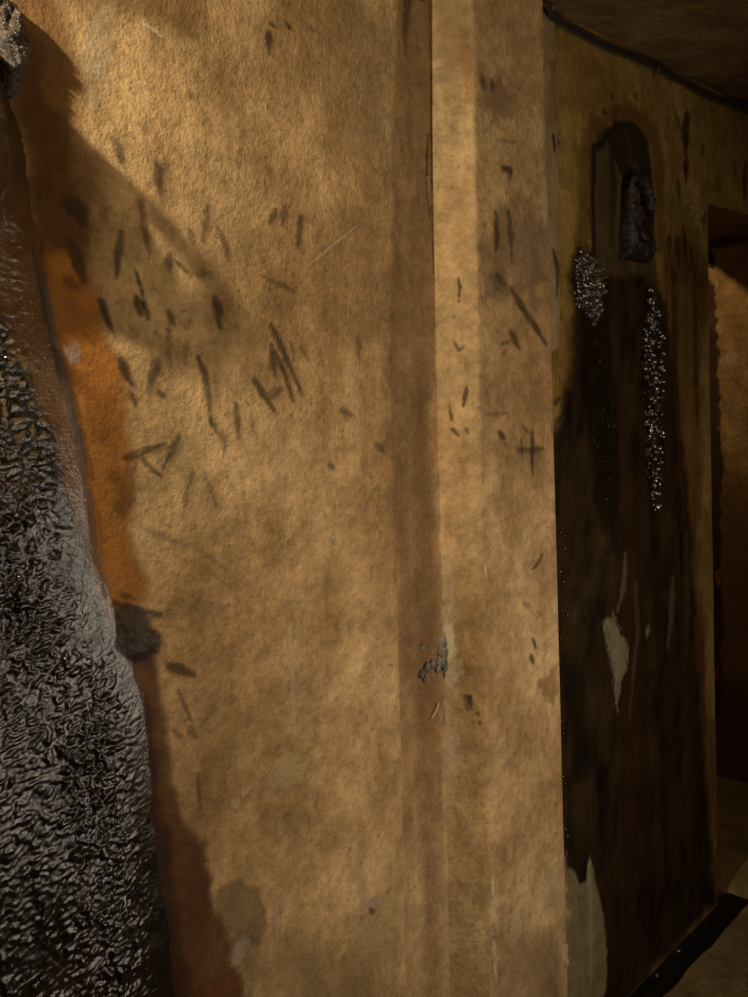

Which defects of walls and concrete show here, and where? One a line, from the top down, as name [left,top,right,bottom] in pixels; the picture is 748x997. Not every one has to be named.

water stain [69,242,86,282]
rust [10,0,144,610]
water stain [99,299,113,330]
water stain [135,272,149,317]
water stain [118,357,133,386]
water stain [148,359,164,396]
water stain [124,437,179,467]
water stain [553,253,716,997]